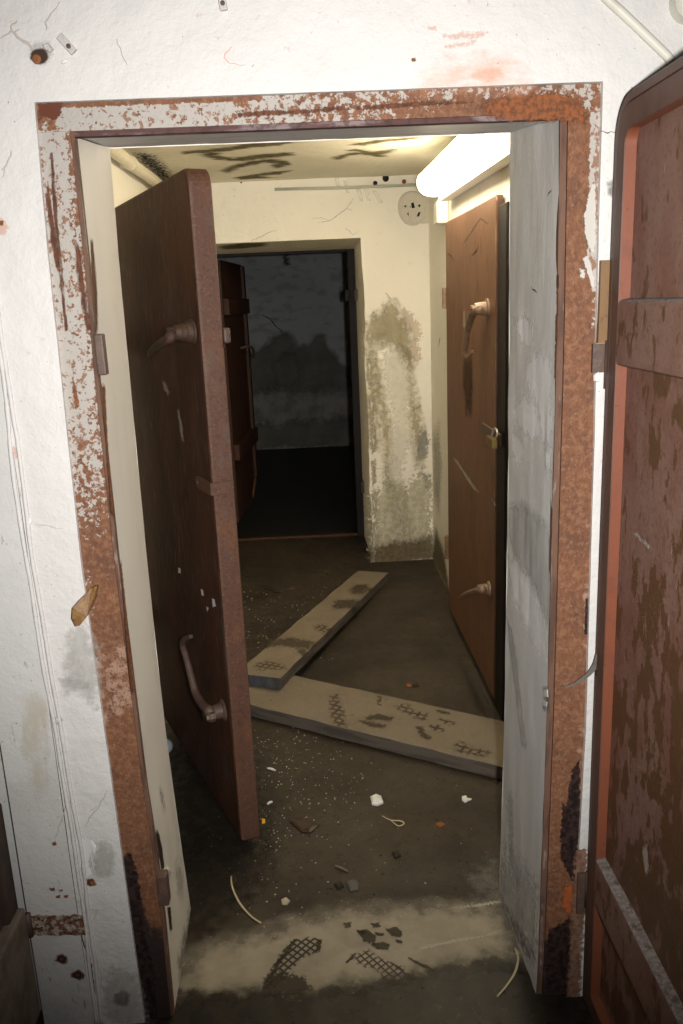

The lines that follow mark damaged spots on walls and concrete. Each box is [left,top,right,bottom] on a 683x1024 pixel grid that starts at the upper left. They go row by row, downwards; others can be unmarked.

rust [38,101,63,122]
rust [238,90,588,125]
rust [46,153,67,331]
rust [76,241,98,333]
rust [102,385,115,516]
damp [364,304,449,591]
rust [119,561,134,694]
rust [562,849,588,998]